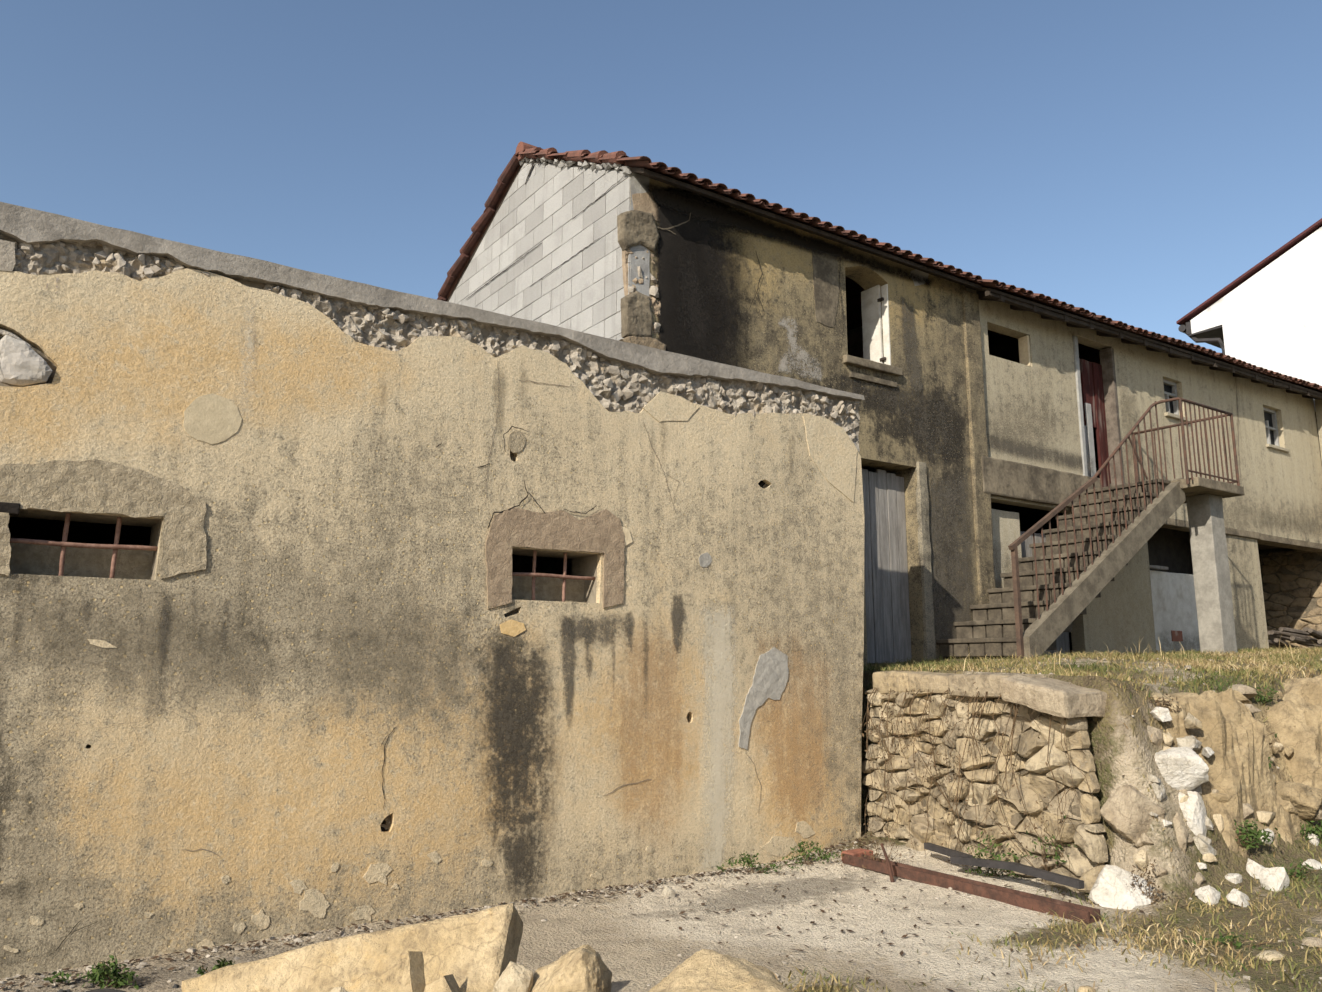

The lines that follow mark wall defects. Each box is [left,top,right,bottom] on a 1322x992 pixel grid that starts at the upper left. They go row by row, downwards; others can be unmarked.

spalling [0,329,52,387]
spalling [0,234,216,281]
spalling [263,284,860,502]
spalling [617,192,666,351]
peeling [812,238,839,328]
water stain [842,298,959,460]
water stain [671,595,684,651]
water stain [929,477,973,641]
water stain [481,612,647,897]